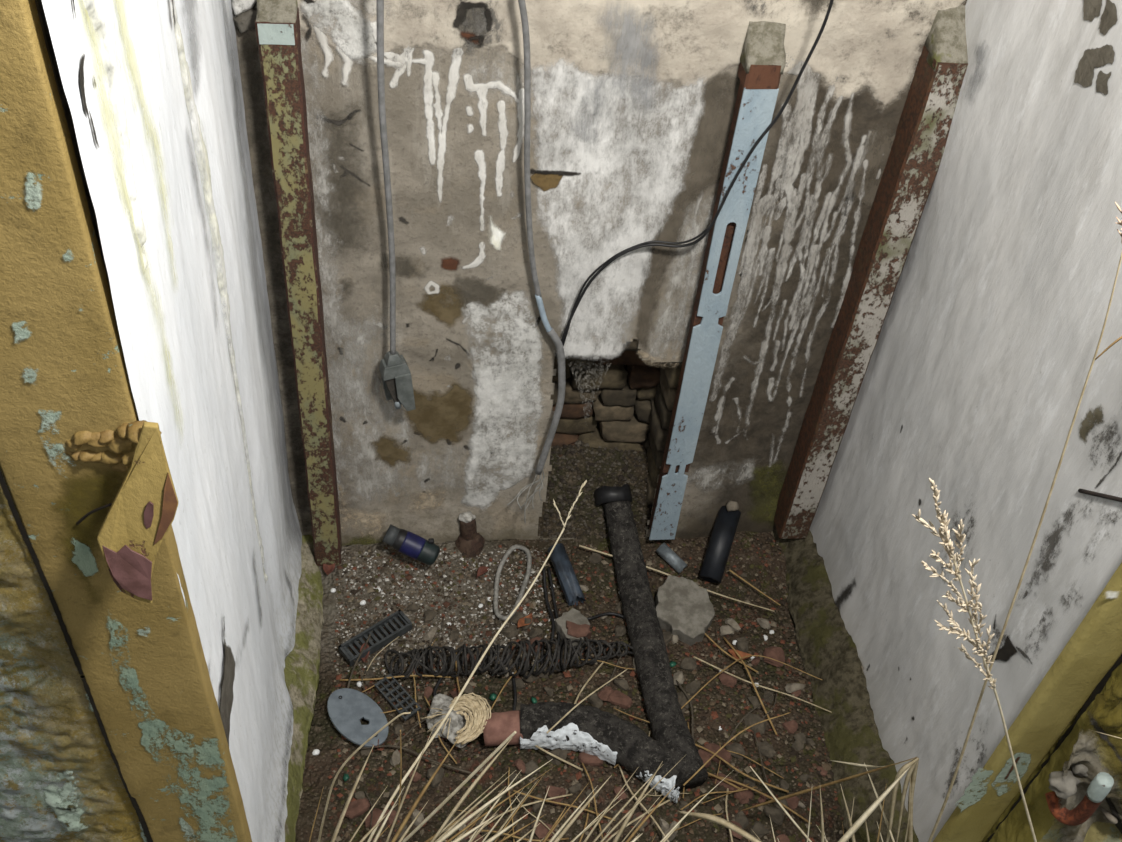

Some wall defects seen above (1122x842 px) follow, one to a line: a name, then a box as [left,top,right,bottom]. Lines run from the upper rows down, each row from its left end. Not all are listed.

spalling [231,0,257,33]
peeling [1074,0,1118,95]
damp [301,0,524,269]
peeling [25,172,42,209]
flaking render [297,0,965,367]
damp [636,74,740,347]
damp [419,286,466,326]
damp [711,53,896,468]
peeling [38,410,75,477]
damp [406,384,474,443]
peeling [107,609,237,842]
peeling [943,731,1031,812]